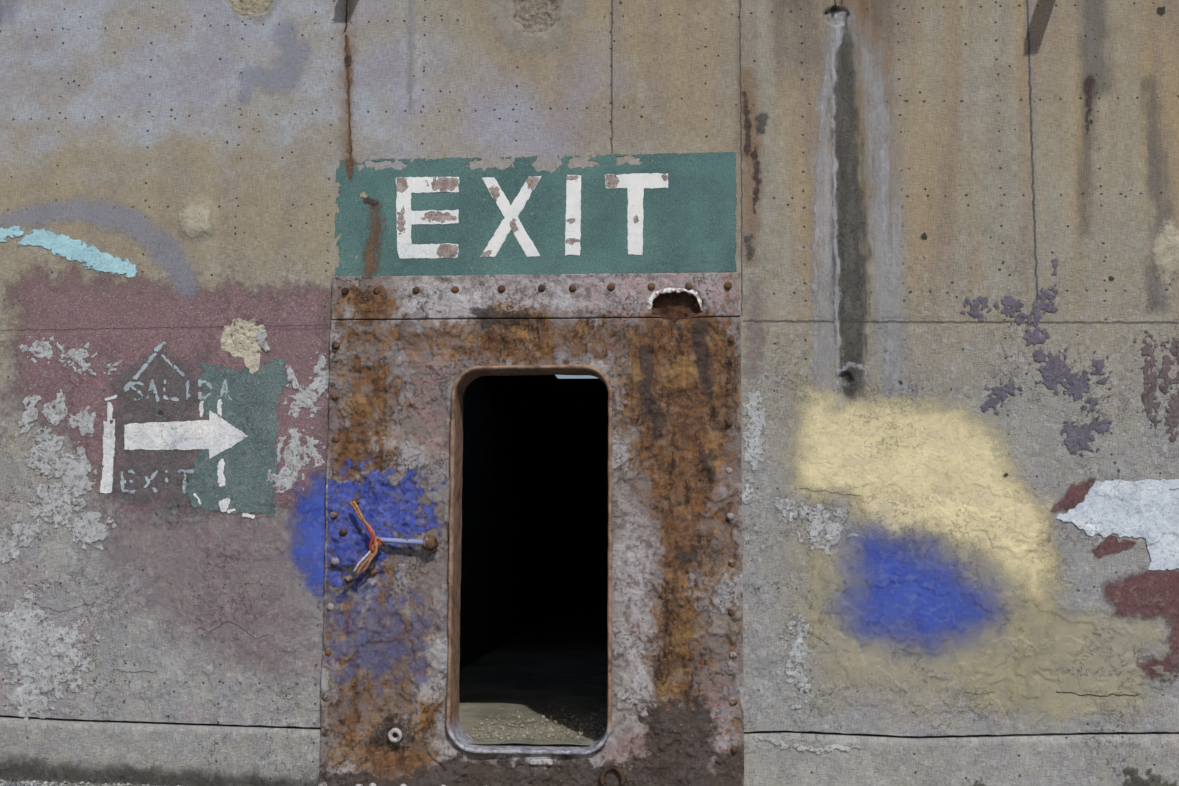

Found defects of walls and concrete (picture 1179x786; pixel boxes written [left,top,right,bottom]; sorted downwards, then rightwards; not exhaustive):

corrosion [360,192,381,276]
damp [812,5,909,401]
crack [739,0,1179,324]
peeling [0,389,124,564]
peeling [18,336,122,381]
spalling [220,318,270,374]
peeling [265,351,329,493]
peeling [957,258,1112,456]
peeling [1131,330,1179,442]
peeling [0,583,101,721]